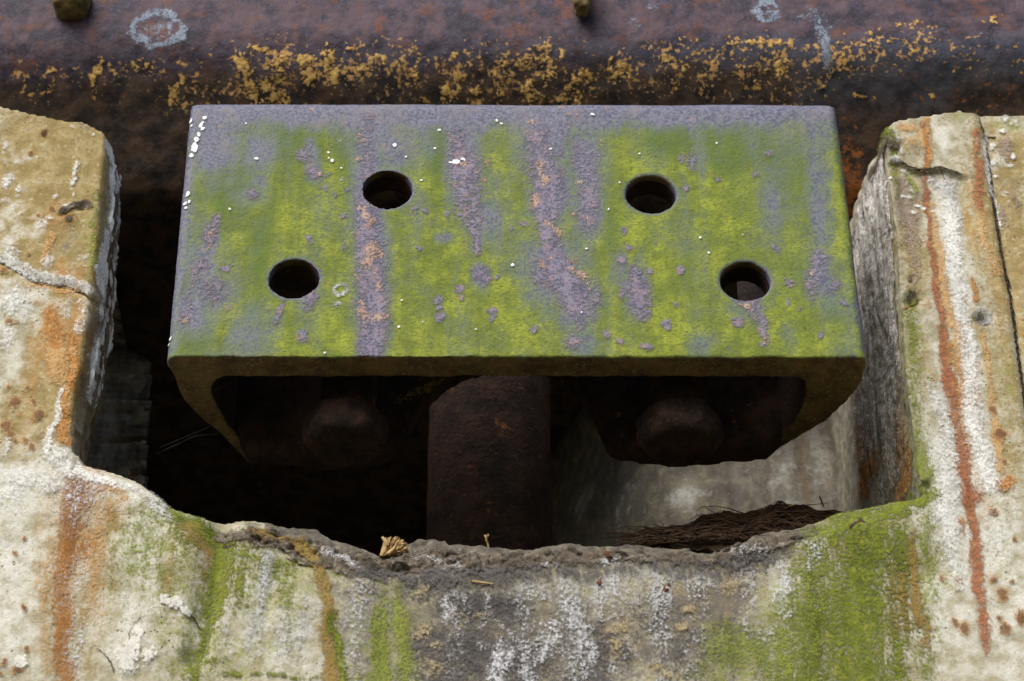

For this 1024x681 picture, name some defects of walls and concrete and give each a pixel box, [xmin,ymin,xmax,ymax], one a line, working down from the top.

crack [900,160,963,180]
corrosion [29,283,84,448]
water stain [343,131,1002,681]
corrosion [898,117,1024,657]
corrosion [21,463,128,681]